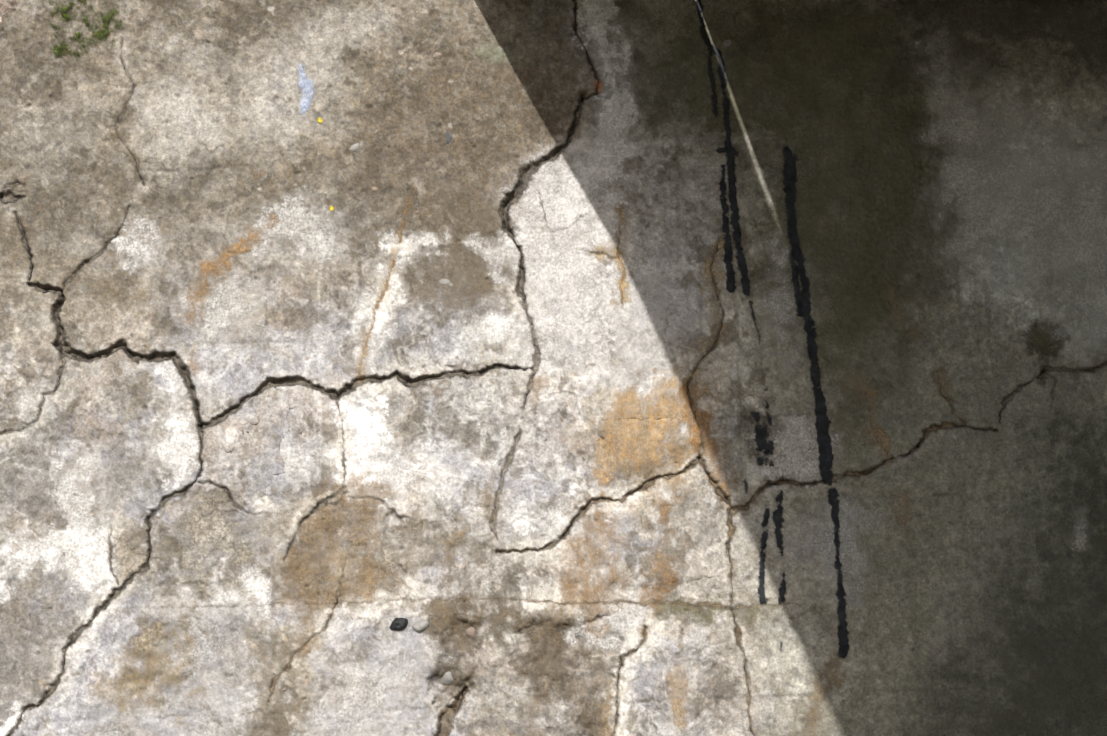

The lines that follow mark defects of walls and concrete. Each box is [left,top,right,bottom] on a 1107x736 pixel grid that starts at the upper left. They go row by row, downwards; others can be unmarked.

spalling [0,0,15,22]
efflorescence [112,225,154,269]
corrosion [189,230,260,320]
efflorescence [238,195,345,263]
crack [583,213,626,301]
corrosion [595,246,630,304]
damp [356,0,1107,402]
crack [0,0,598,736]
corrosion [593,368,735,501]
damp [735,415,820,489]
crack [489,245,1107,736]
damp [925,412,1107,736]